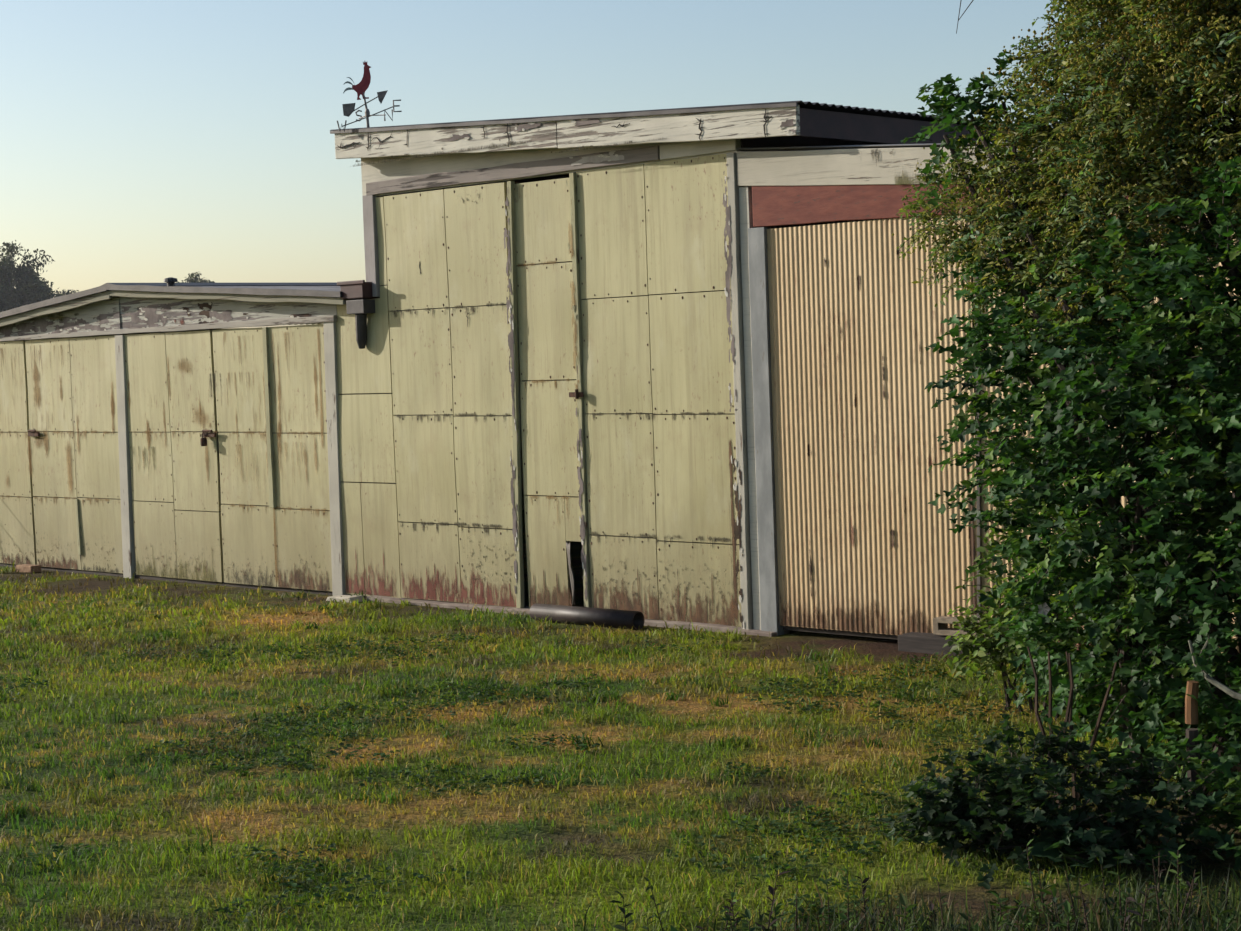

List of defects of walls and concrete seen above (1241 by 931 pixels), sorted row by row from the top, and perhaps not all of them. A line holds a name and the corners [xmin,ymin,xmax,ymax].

peeling [447,128,470,141]
peeling [512,122,541,132]
peeling [571,118,600,126]
peeling [778,118,796,136]
peeling [0,302,248,337]
peeling [723,164,737,412]
rust [28,388,114,487]
rust [305,330,323,478]
rust [228,509,329,591]
rust [346,550,572,607]
rust [593,440,739,626]
rust [780,540,928,635]